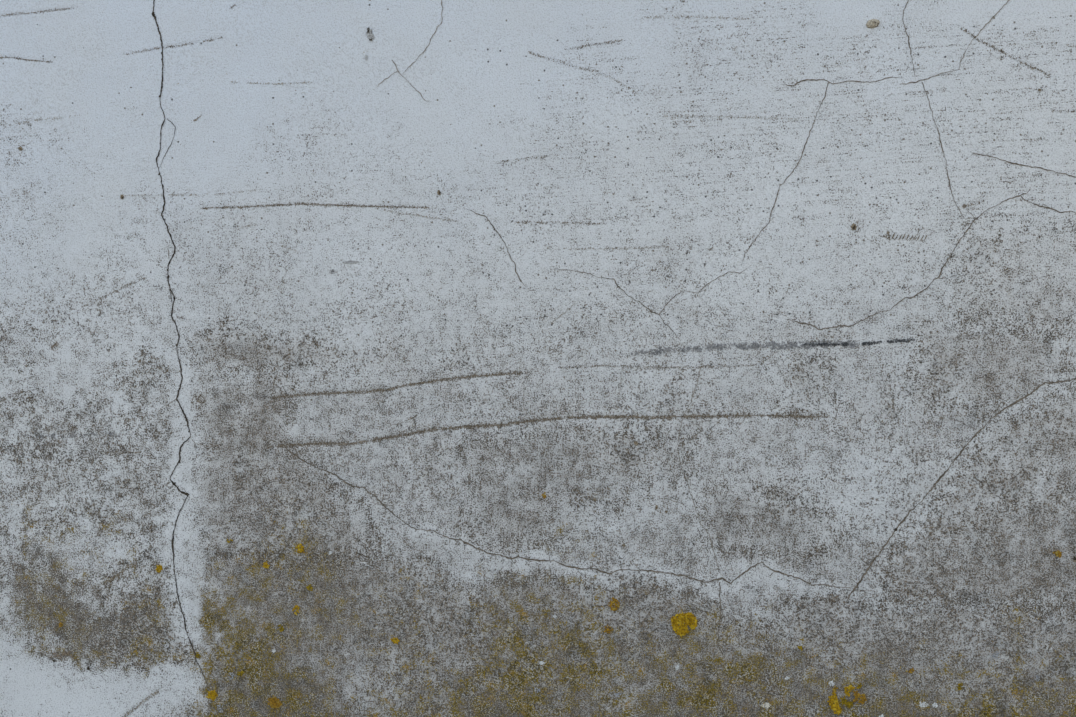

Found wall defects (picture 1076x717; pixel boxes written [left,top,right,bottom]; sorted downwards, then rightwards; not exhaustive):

crack [152,0,208,687]
crack [377,0,443,102]
crack [467,209,536,291]
water stain [0,203,1076,717]
crack [277,353,1076,667]
crack [552,0,1076,335]